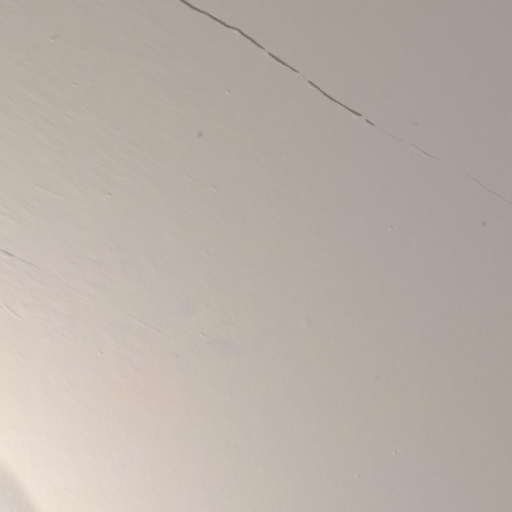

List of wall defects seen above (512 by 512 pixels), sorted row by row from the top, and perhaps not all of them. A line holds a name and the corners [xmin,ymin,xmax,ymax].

crack [180,0,439,160]